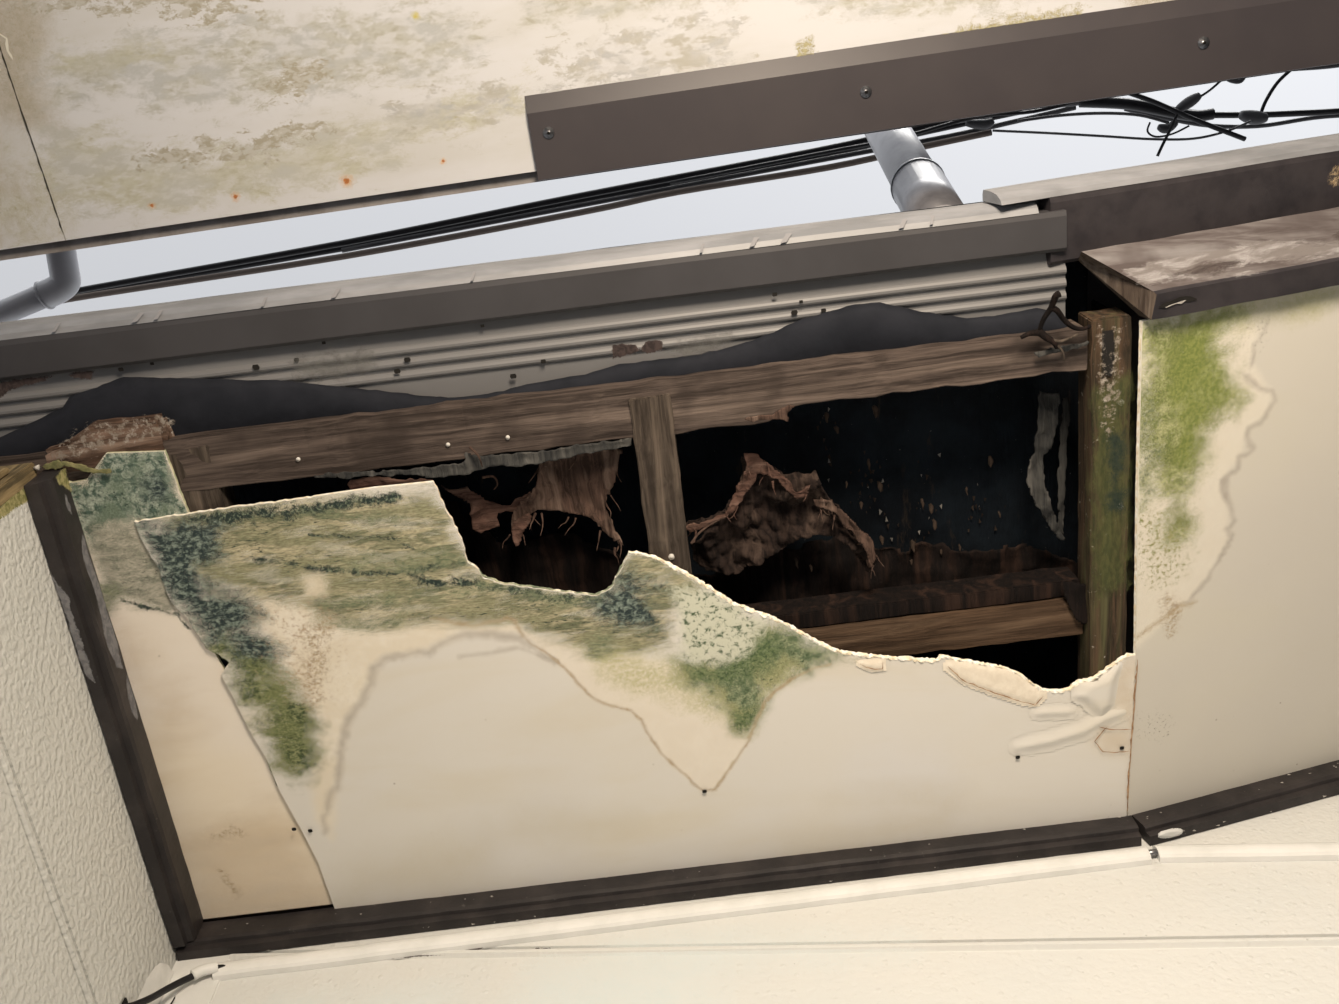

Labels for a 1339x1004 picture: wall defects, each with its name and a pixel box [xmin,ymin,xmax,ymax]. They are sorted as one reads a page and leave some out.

damp [794,34,819,57]
damp [795,0,1091,35]
damp [1118,0,1170,8]
damp [0,0,760,249]
peeling [611,340,663,359]
spalling [1096,325,1123,438]
damp [1088,285,1339,760]
damp [69,451,858,920]